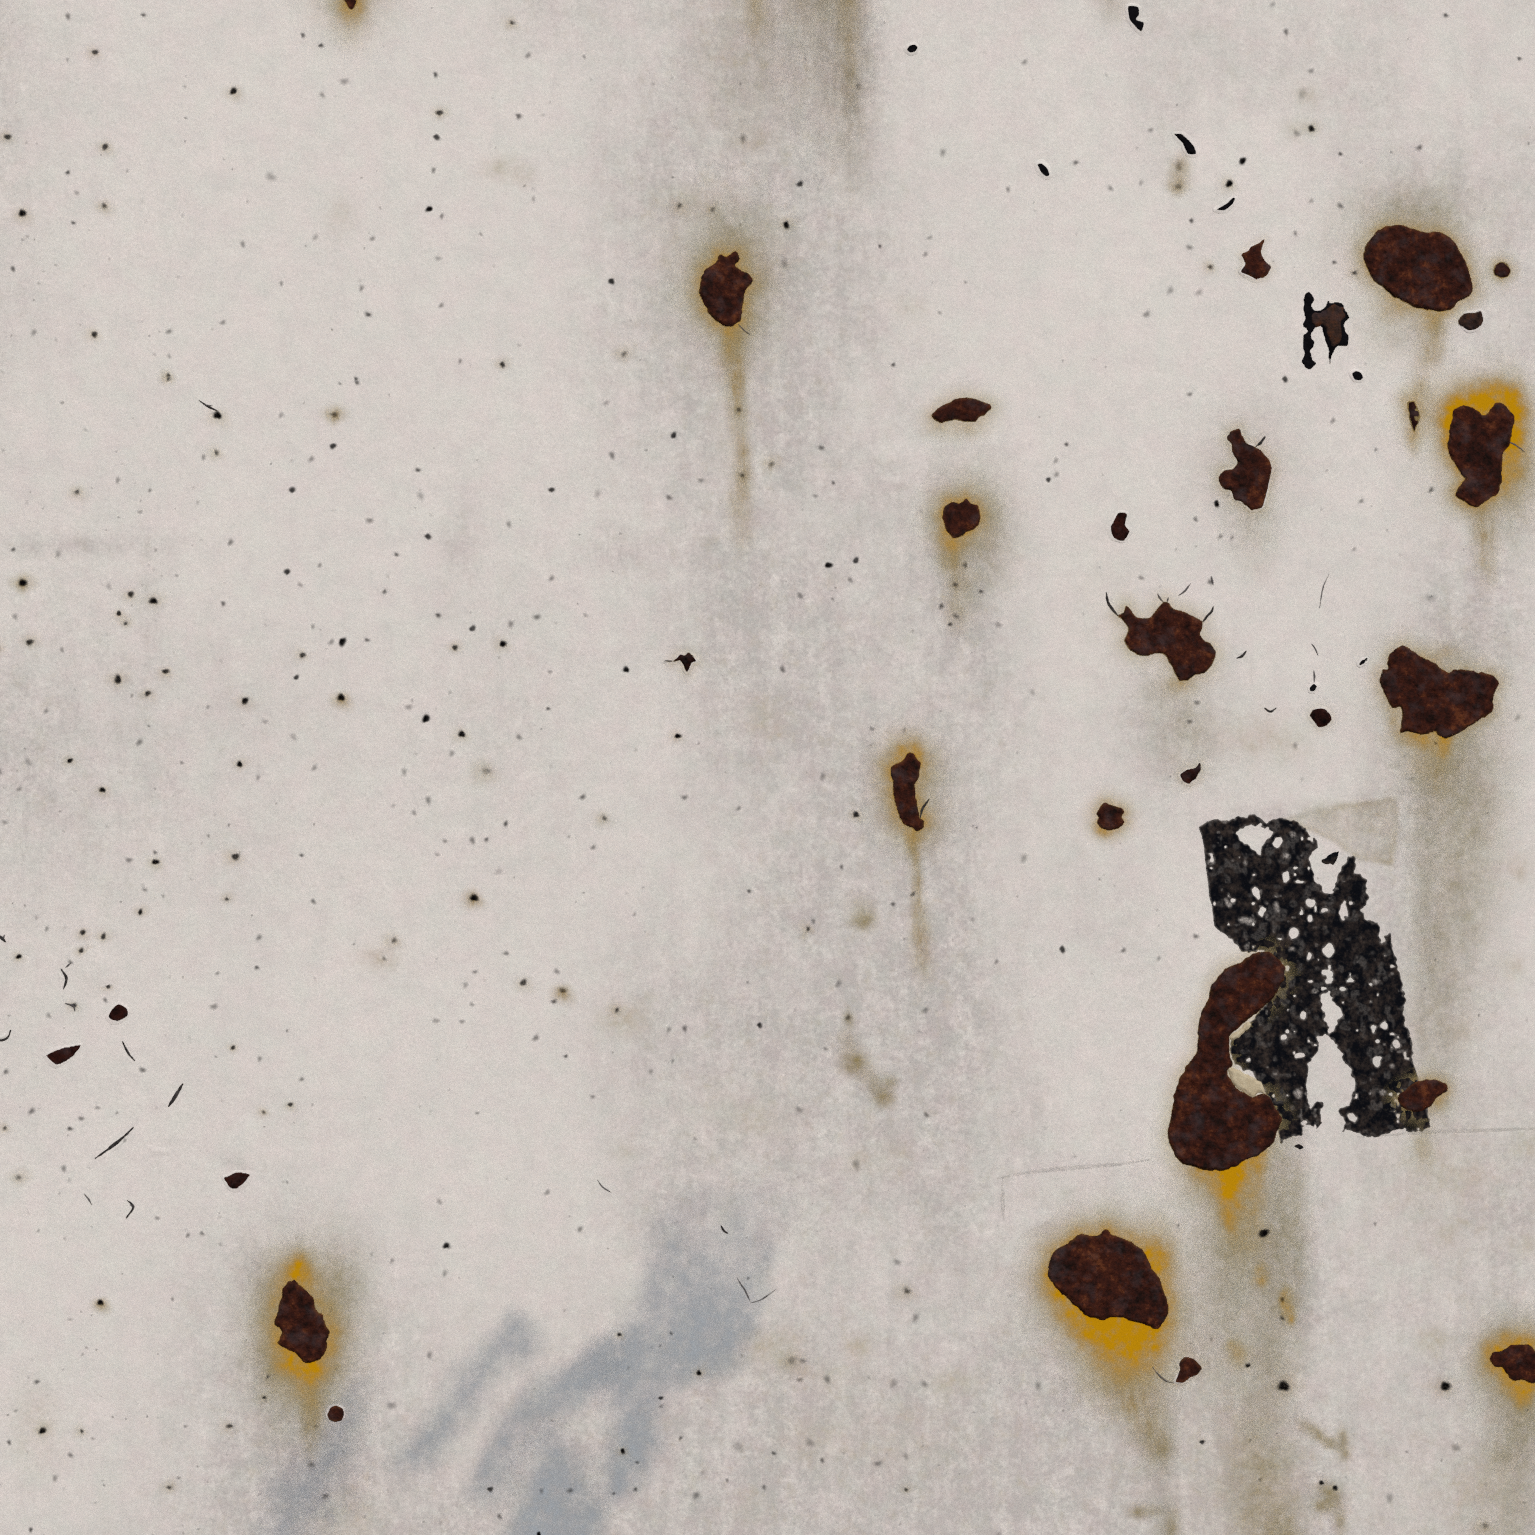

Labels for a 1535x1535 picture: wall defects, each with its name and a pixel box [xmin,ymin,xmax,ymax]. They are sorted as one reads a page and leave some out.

rust [696,230,754,410]
rust [1353,210,1473,323]
rust [931,397,991,423]
rust [1215,426,1274,513]
rust [1436,378,1530,510]
rust [1106,592,1216,684]
rust [1379,645,1499,759]
rust [884,742,930,860]
peeling [1322,851,1339,865]
rust [1167,951,1286,1234]
rust [259,1253,347,1408]
rust [1039,1222,1177,1412]